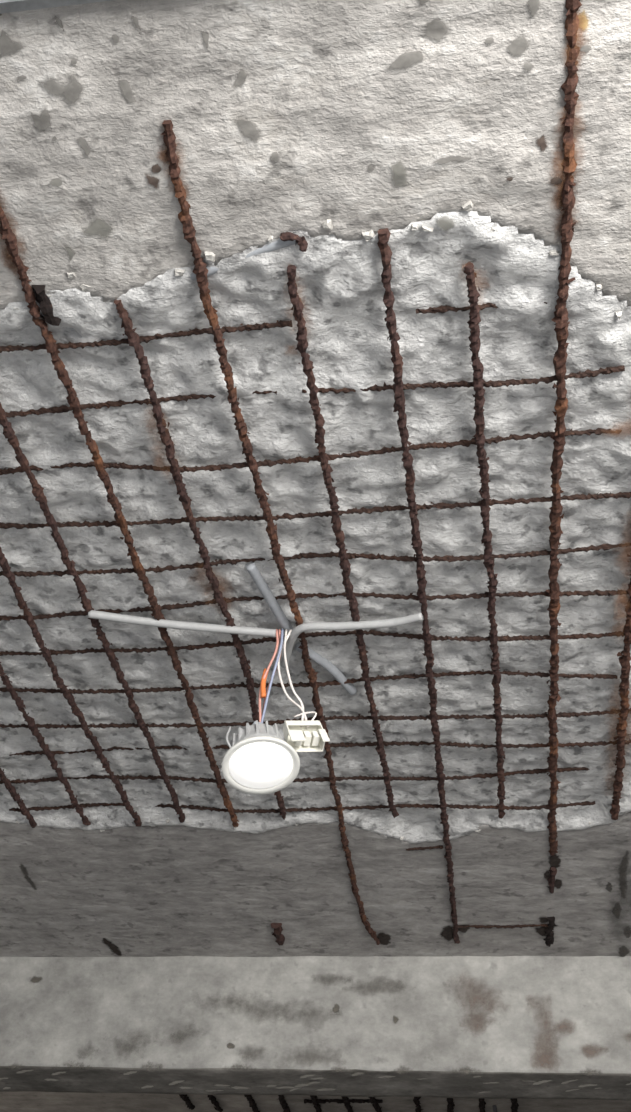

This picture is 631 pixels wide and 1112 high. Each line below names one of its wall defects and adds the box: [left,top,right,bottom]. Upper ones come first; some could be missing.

rust [567,11,588,67]
rust [149,411,171,474]
rust [608,423,631,435]
spalling [79,572,154,618]
spalling [427,597,491,638]
rust [615,531,631,641]
spalling [51,652,124,691]
spalling [431,640,493,673]
spalling [555,636,625,714]
spalling [0,664,137,832]
spalling [88,618,302,827]
spalling [274,629,444,945]